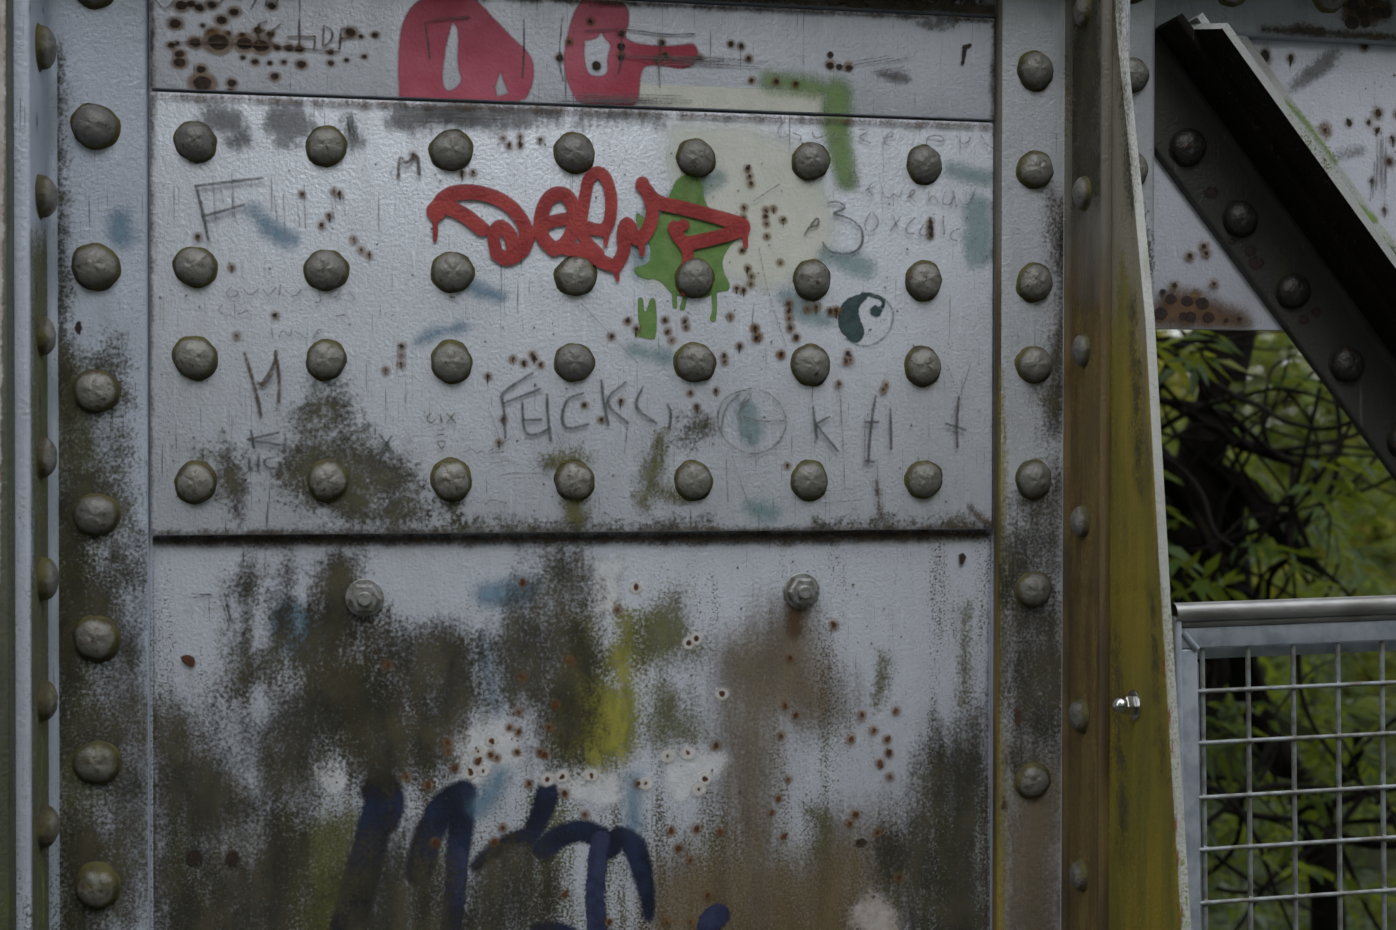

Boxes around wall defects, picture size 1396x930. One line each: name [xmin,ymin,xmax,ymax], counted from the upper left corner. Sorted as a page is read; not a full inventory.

corrosion [497,134,546,147]
corrosion [1347,109,1396,166]
corrosion [738,163,786,246]
corrosion [662,301,689,343]
corrosion [724,248,759,322]
corrosion [721,300,840,370]
corrosion [1154,280,1252,329]
damp [670,412,716,450]
damp [57,42,623,930]
damp [652,458,1063,930]
corrosion [444,709,598,797]
corrosion [848,711,893,780]